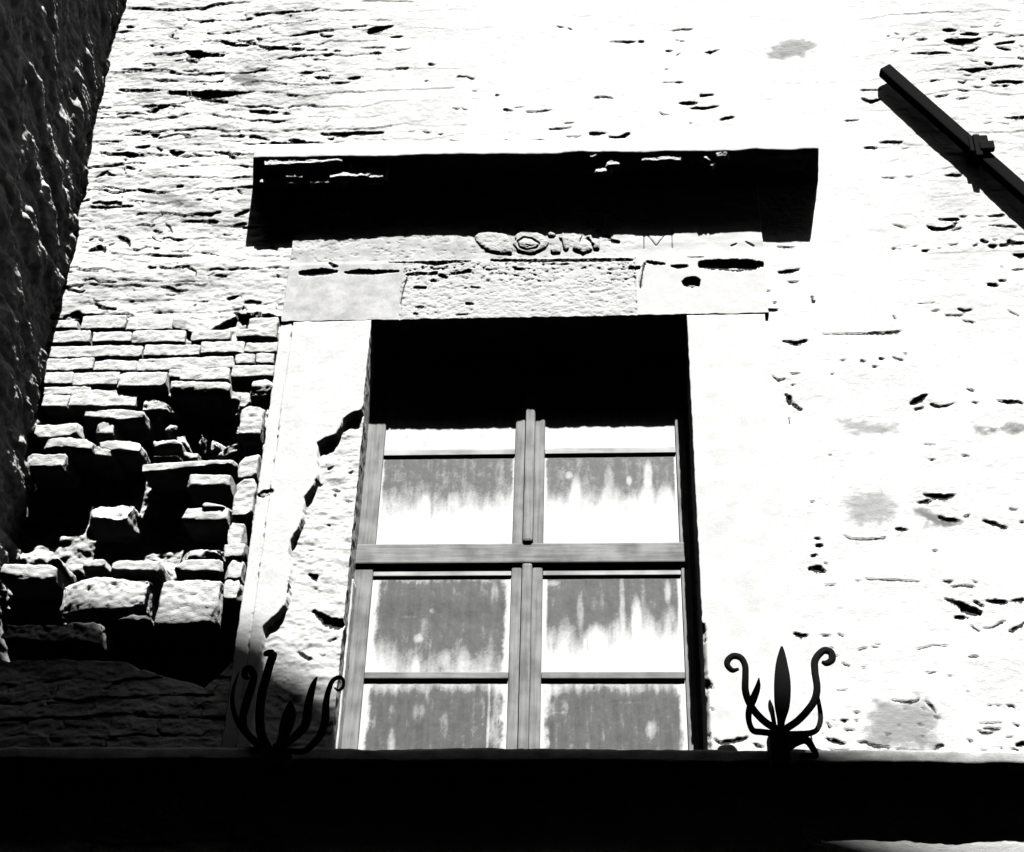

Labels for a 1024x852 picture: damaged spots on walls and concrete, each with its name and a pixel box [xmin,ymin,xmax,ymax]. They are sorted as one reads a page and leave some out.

spalling [0,372,273,662]